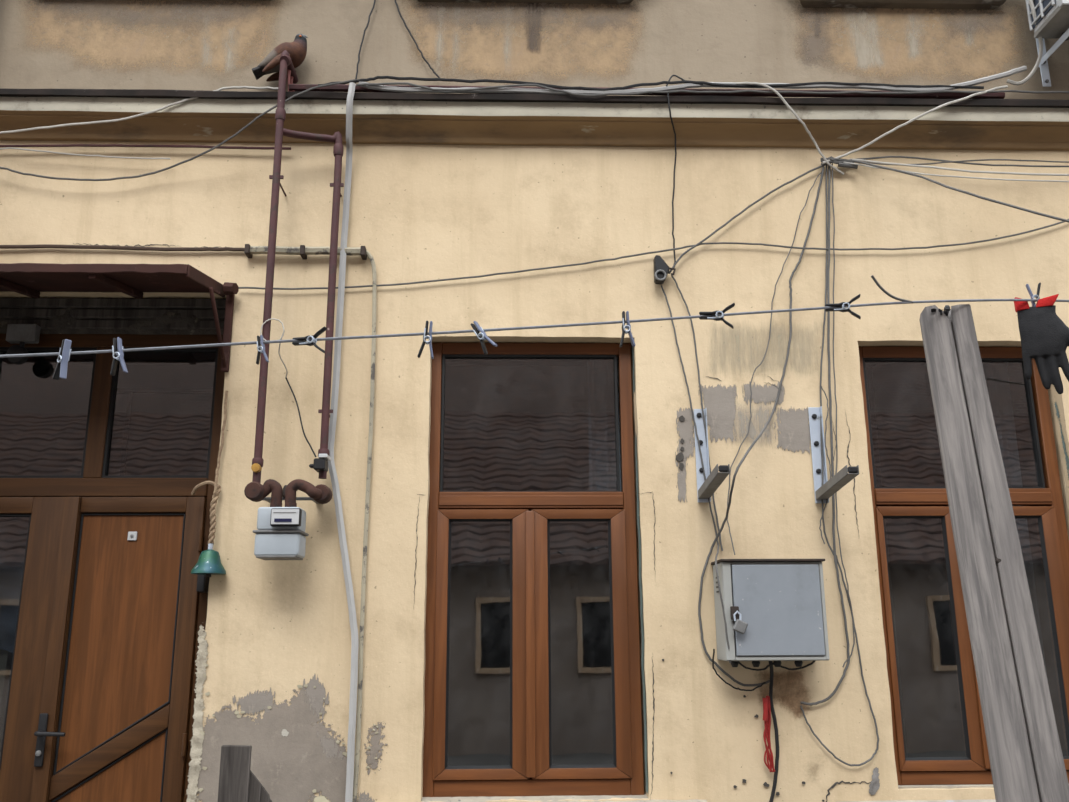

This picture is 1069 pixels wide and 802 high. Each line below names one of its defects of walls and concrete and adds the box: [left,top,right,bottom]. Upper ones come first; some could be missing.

leakage [28,0,271,72]
flaking render [675,382,811,503]
peeling [185,625,388,802]